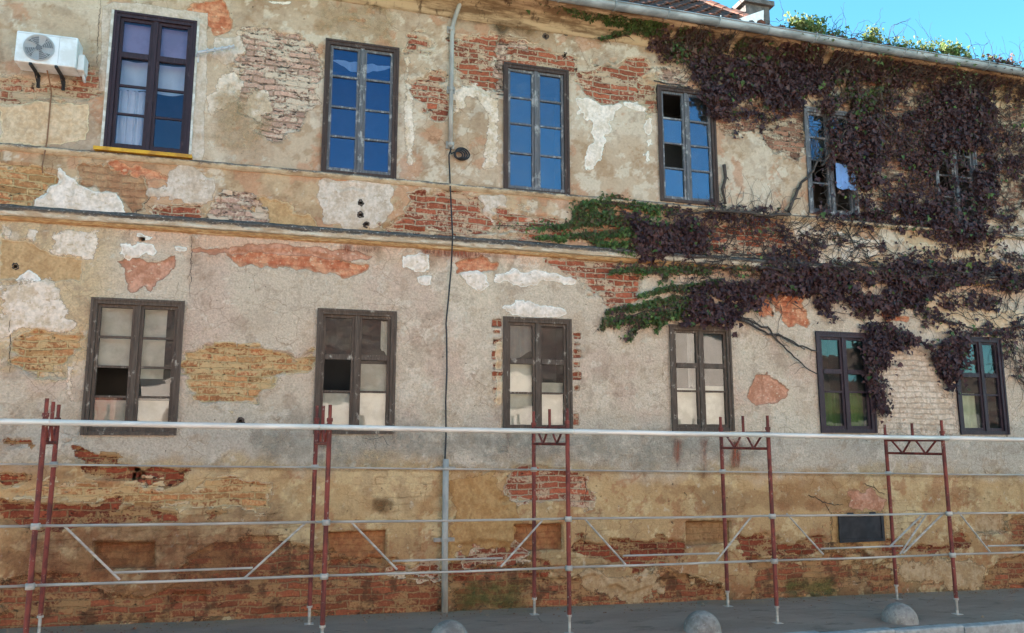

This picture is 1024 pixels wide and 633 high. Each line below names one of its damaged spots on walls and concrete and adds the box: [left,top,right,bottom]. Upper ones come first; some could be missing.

flaking render [0,0,894,293]
flaking render [0,226,99,402]
flaking render [180,341,316,423]
spalling [747,372,789,406]
flaking render [878,345,959,441]
flaking render [3,437,35,450]
flaking render [0,442,273,533]
flaking render [0,464,727,629]
flaking render [735,514,1024,599]